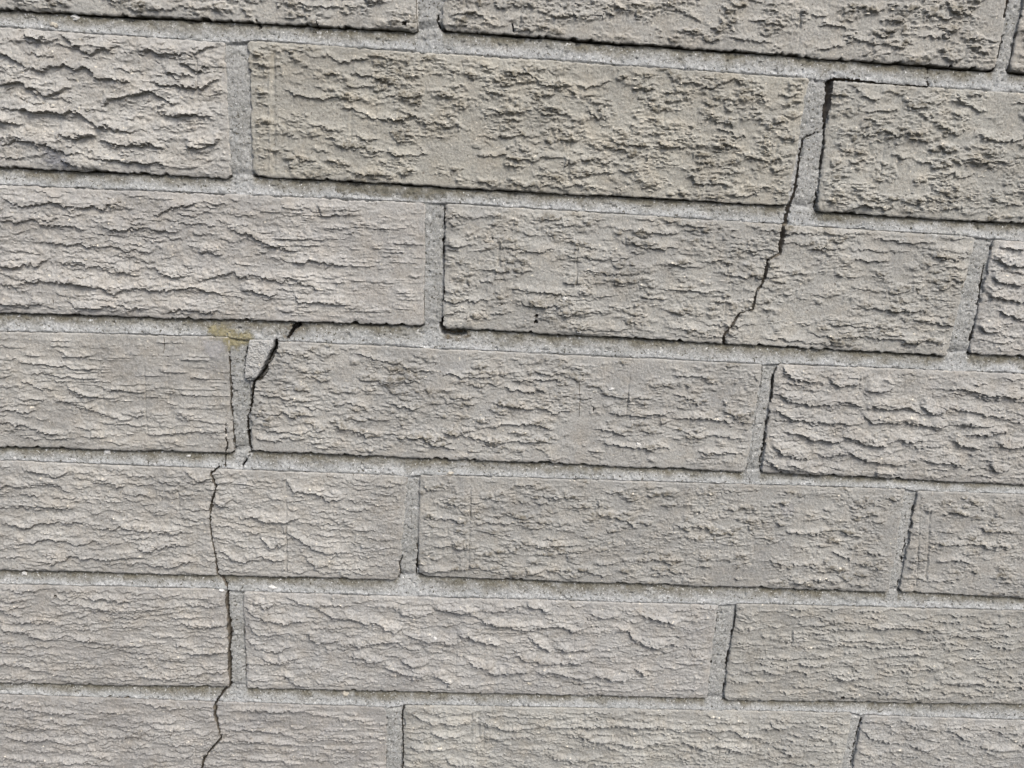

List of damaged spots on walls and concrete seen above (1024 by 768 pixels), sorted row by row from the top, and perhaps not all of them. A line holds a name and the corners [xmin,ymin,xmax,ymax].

crack [722,70,929,343]
crack [201,322,301,768]